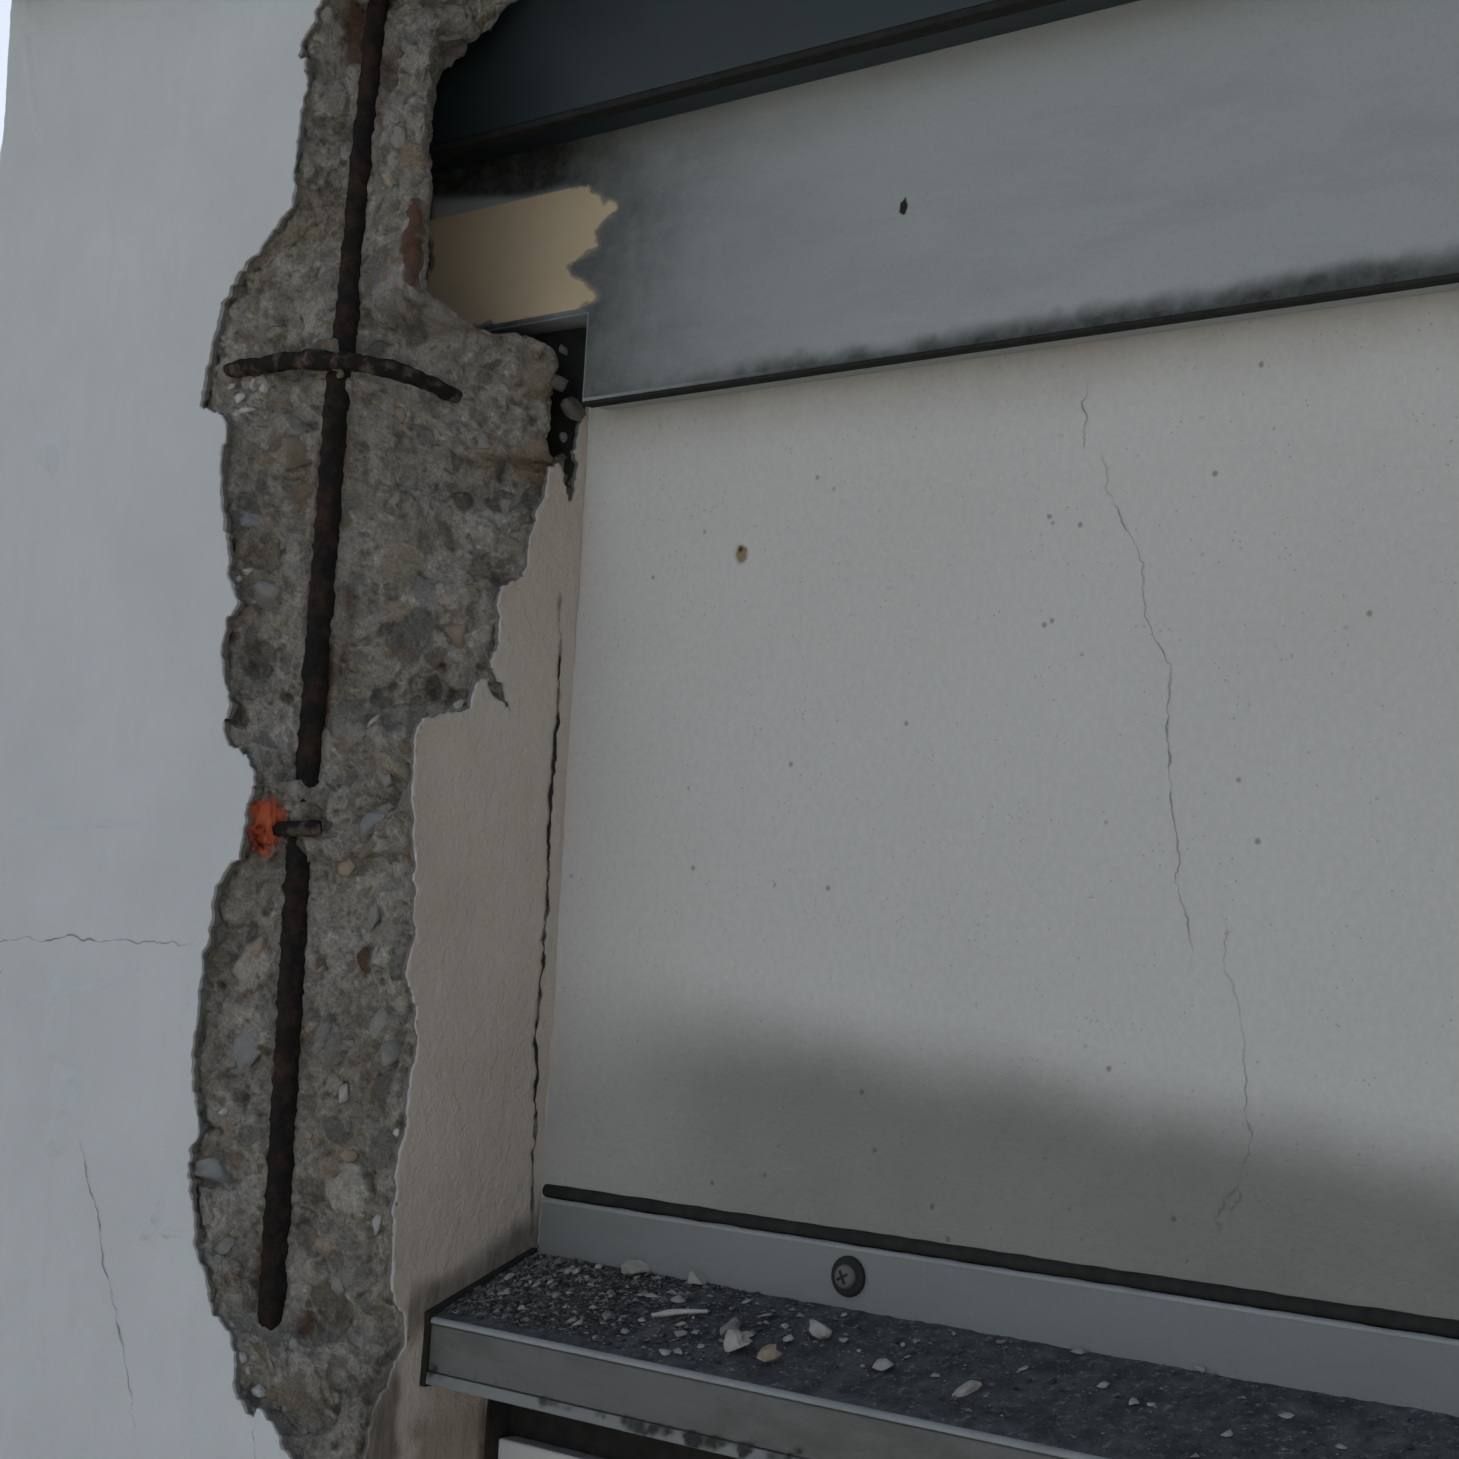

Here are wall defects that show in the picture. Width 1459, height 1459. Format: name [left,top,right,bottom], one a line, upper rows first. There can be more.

rust [401,199,423,286]
spalling [192,0,618,1459]
rust [247,798,285,858]
rust [356,948,370,974]